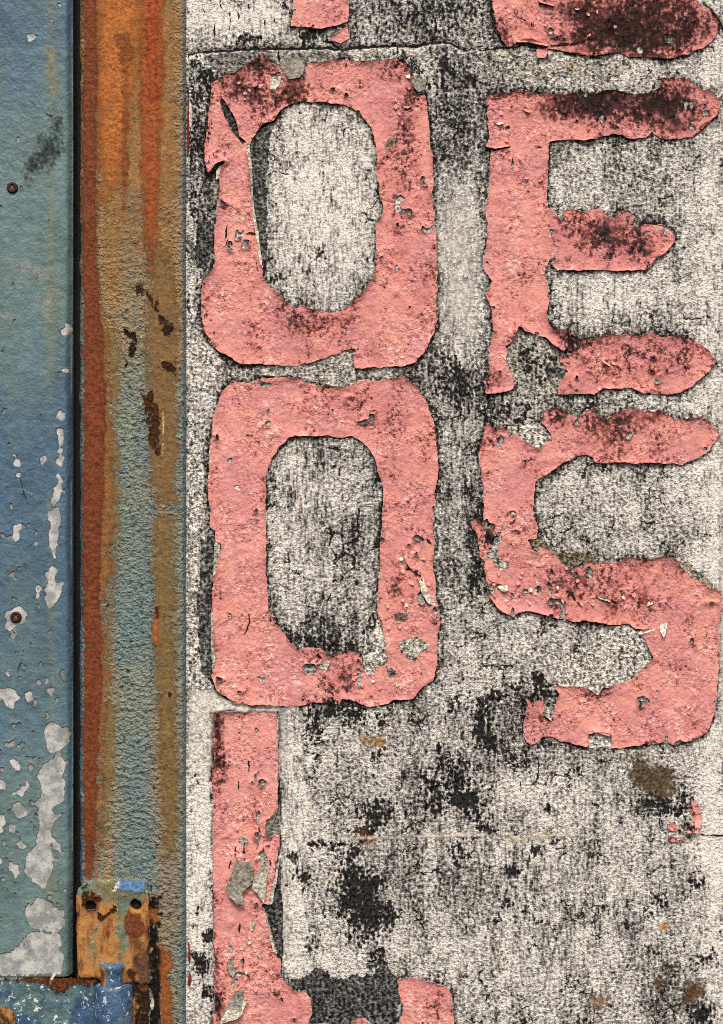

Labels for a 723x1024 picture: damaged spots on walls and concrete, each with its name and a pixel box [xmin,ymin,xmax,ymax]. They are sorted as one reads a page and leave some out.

peeling [220,99,271,270]
peeling [506,327,568,396]
corrosion [81,0,182,1024]
peeling [548,623,667,695]
peeling [0,721,72,979]
damp [281,667,599,970]
damp [620,752,697,835]
peeling [221,807,283,1024]
damp [644,892,668,918]
peeling [291,947,401,1024]
damp [641,945,680,991]
damp [682,979,716,1024]